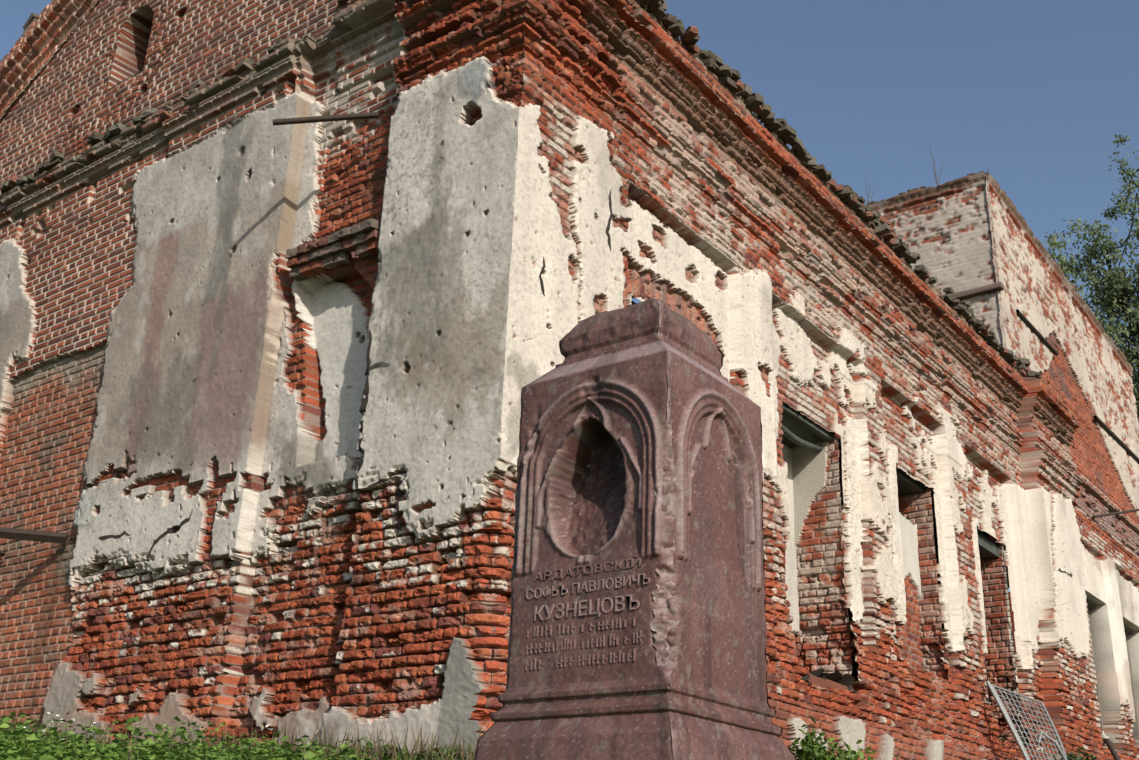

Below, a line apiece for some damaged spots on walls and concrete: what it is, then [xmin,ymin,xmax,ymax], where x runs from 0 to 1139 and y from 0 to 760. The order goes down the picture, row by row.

crack [605,190,613,250]
flaking render [0,238,36,431]
crack [355,330,402,531]
spalling [40,56,878,760]
crack [98,512,192,565]
spalling [763,397,1139,760]